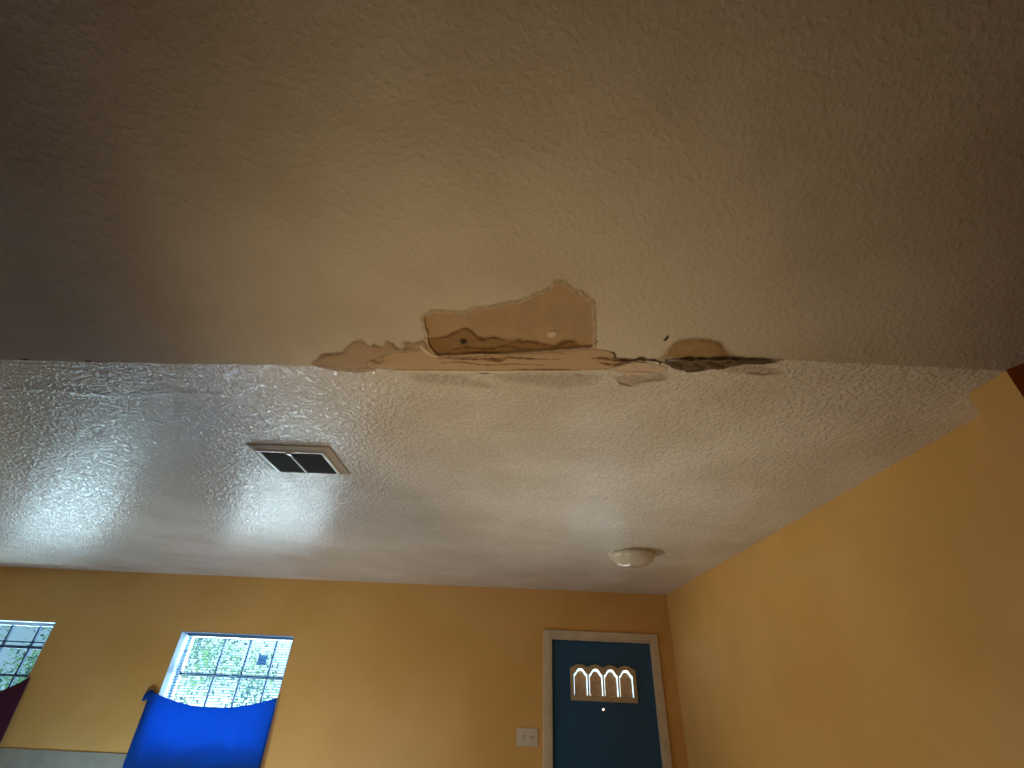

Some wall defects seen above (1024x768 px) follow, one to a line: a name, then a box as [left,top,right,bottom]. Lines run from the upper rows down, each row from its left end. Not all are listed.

flaking render [366,279,667,377]